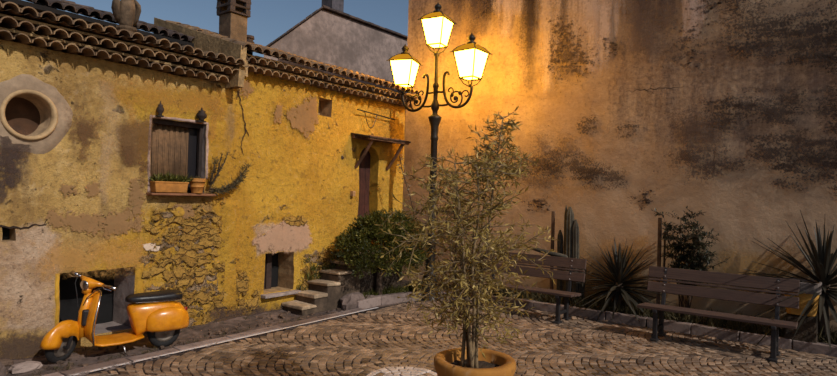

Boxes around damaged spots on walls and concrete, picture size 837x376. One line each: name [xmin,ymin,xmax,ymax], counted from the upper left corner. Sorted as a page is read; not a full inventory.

leakage [493,0,618,91]
leakage [713,0,837,70]
leakage [0,128,30,203]
leakage [495,115,628,190]
leakage [669,83,837,196]
crack [0,210,52,229]
flaking render [45,178,261,325]
flaking render [252,215,312,254]